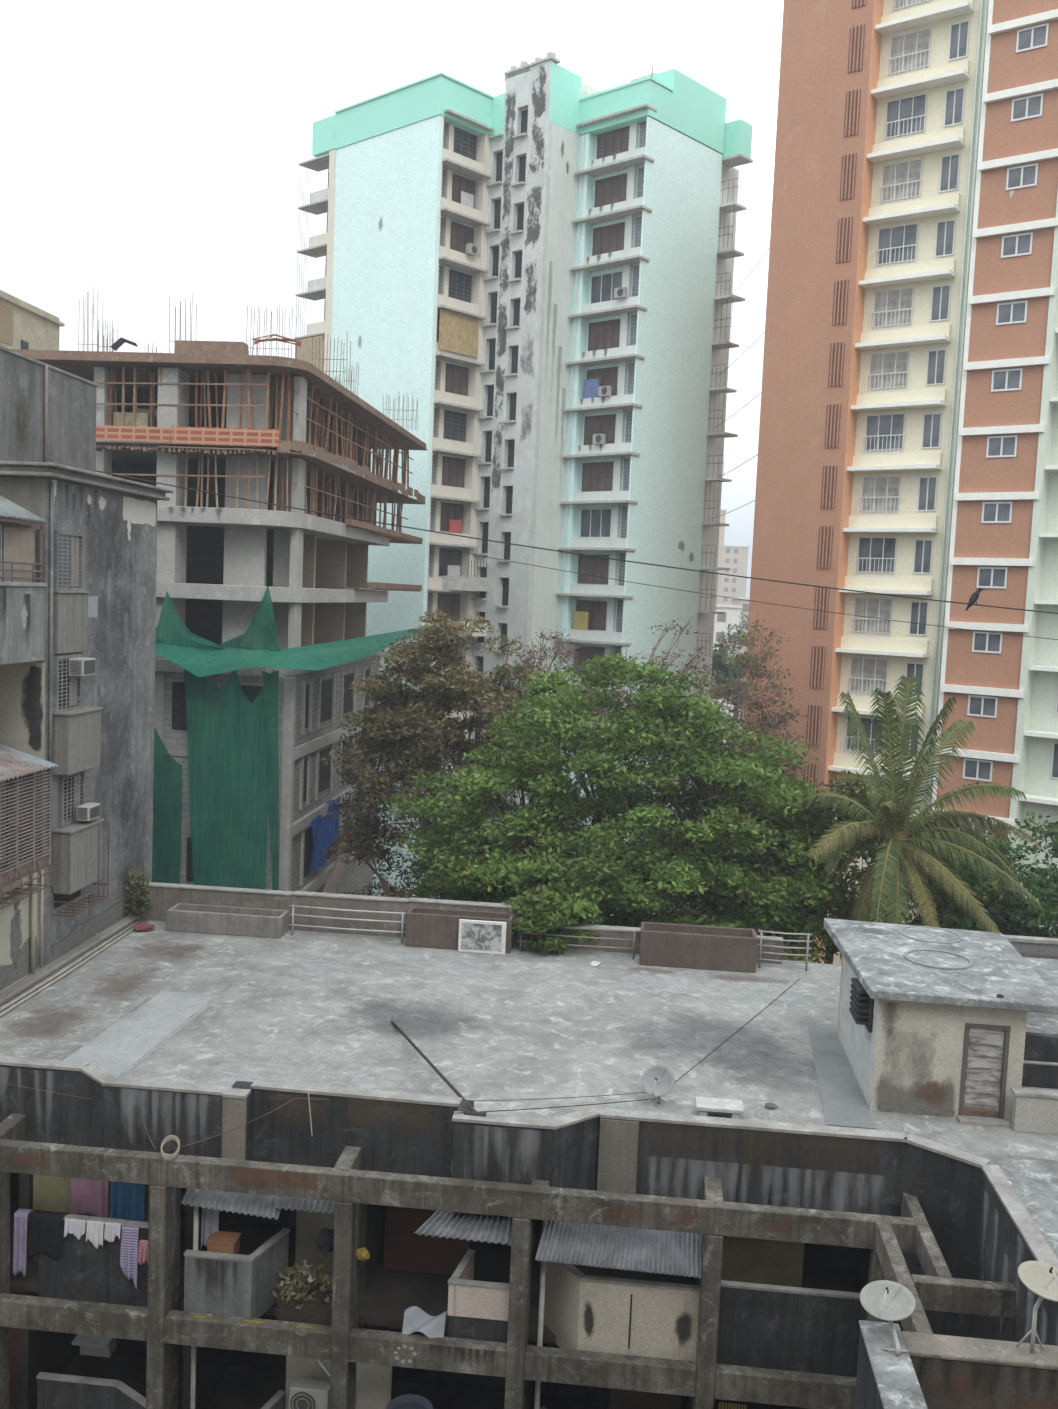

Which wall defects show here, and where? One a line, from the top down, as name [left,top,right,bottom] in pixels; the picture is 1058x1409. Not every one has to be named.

leakage [492,66,546,492]
peeling [87,494,106,512]
peeling [123,496,156,547]
leakage [0,887,131,991]
leakage [21,1067,46,1114]
leakage [652,1122,782,1163]